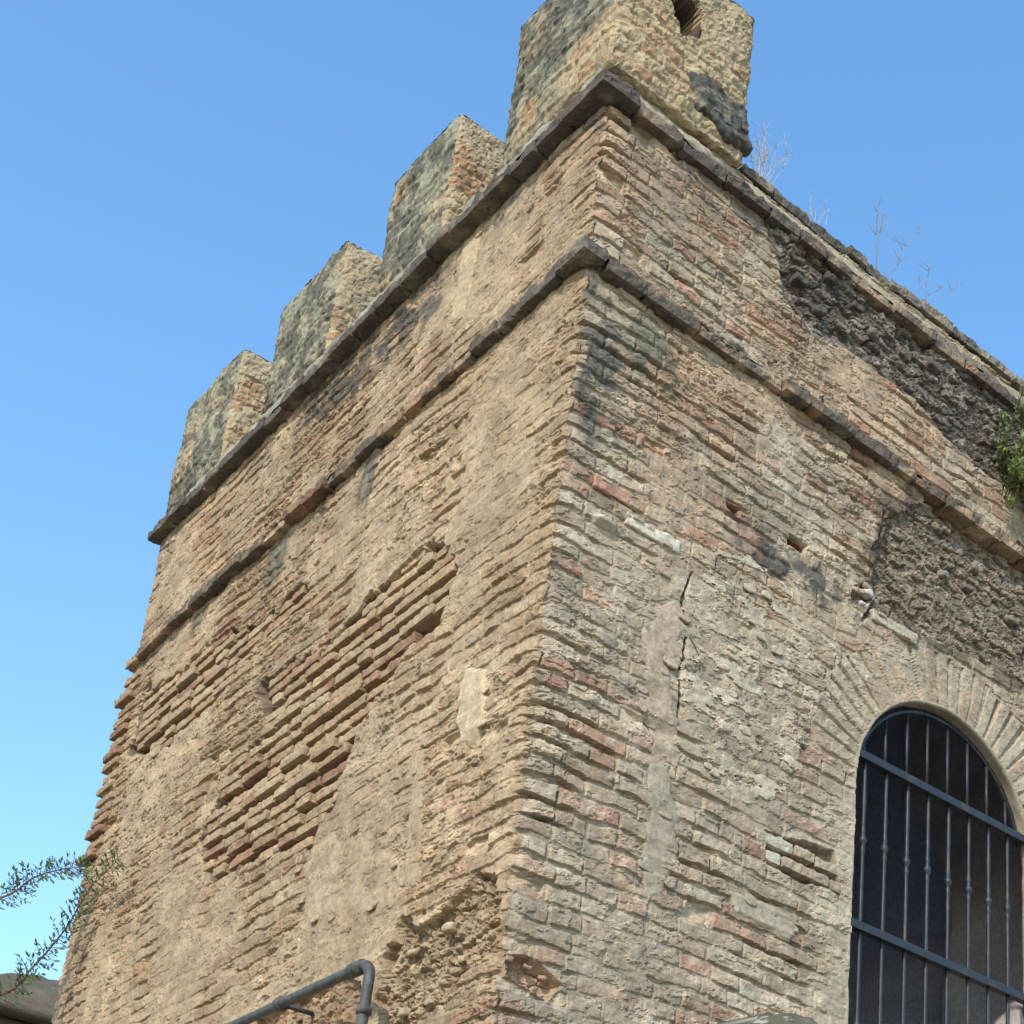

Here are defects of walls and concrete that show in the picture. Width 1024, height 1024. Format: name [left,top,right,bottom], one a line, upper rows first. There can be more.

spalling [764,216,1024,492]
spalling [128,585,311,761]
spalling [193,544,458,885]
crack [676,575,700,717]
spalling [850,487,1024,689]
spalling [374,873,562,1024]